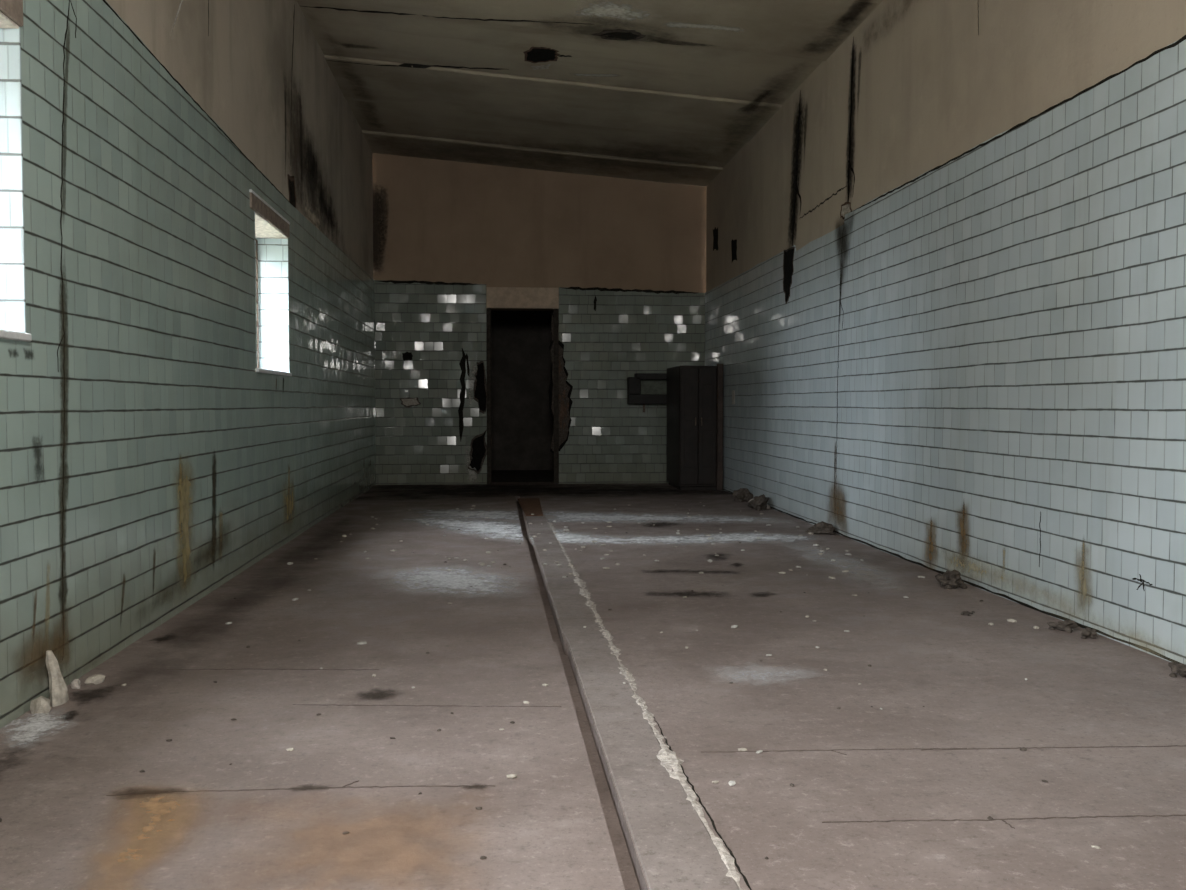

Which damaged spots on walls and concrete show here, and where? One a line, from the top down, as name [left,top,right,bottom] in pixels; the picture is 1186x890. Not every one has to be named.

crack [103,0,294,207]
leakage [788,100,807,244]
leakage [846,45,861,200]
crack [57,0,77,558]
leakage [836,223,849,313]
spalling [467,429,487,480]
spalling [469,361,487,414]
spalling [549,313,573,454]
rust [830,445,846,528]
rust [926,521,935,565]
rust [954,505,984,572]
crack [770,507,1180,663]